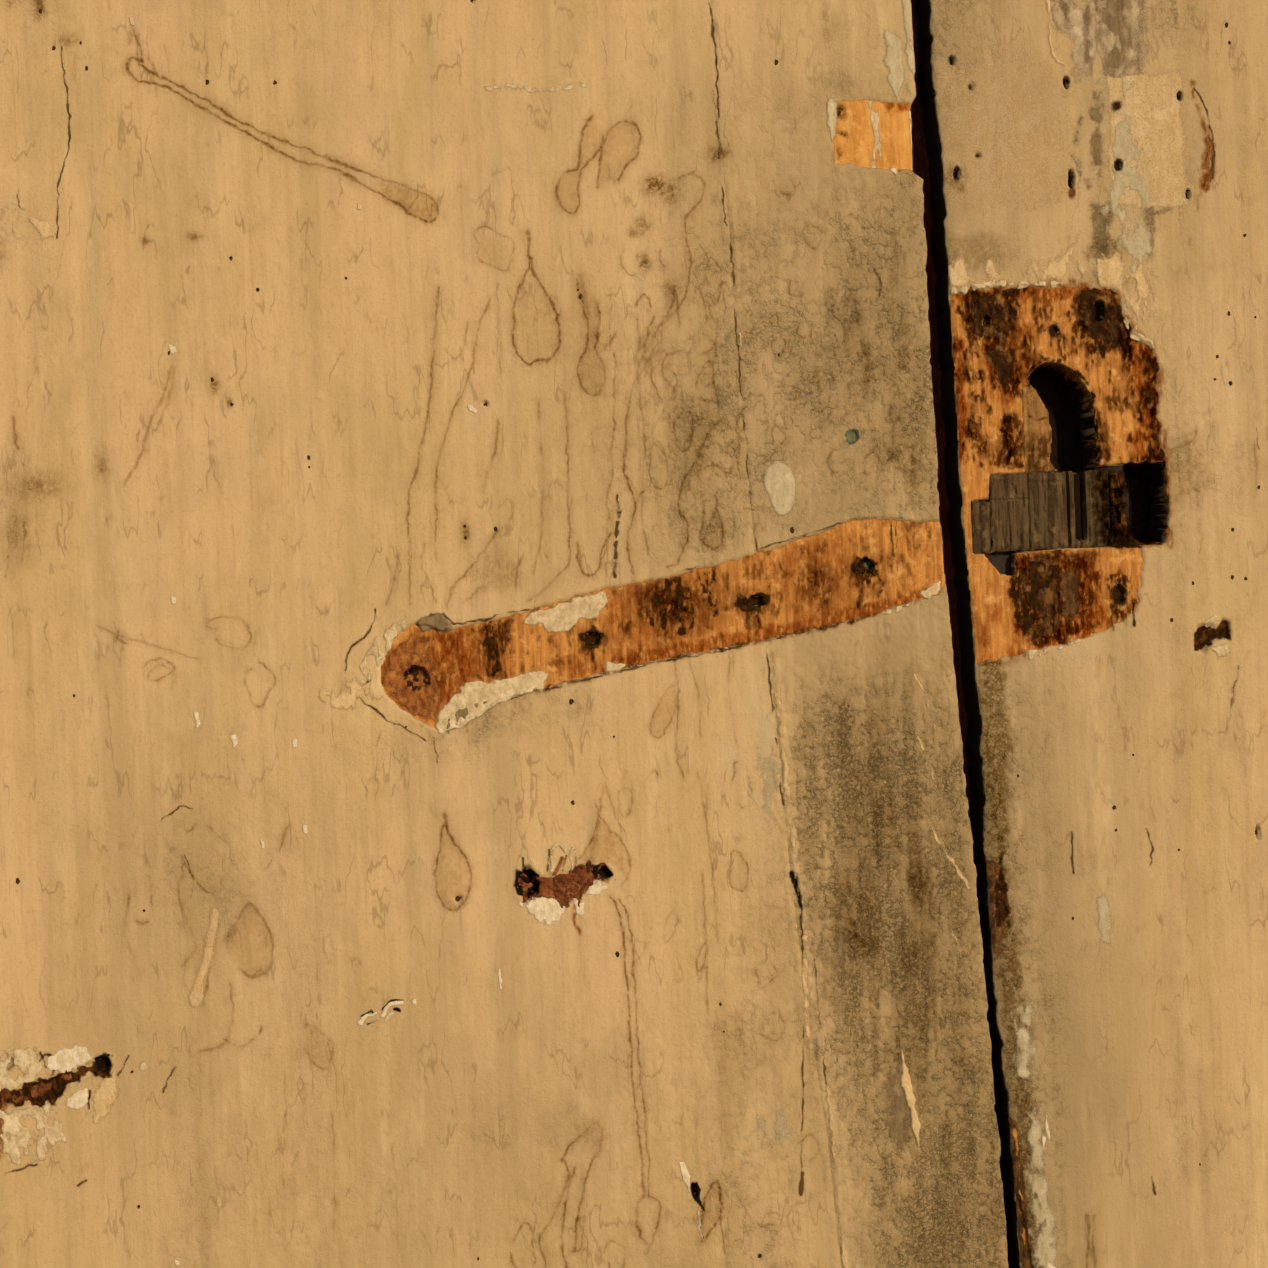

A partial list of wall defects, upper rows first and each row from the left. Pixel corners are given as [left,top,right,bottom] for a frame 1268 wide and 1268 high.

peeling [1046,0,1148,78]
crack [709,4,724,158]
peeling [827,0,914,174]
crack [722,188,735,284]
crack [734,315,751,495]
spalling [1194,615,1231,658]
spalling [514,868,540,898]
spalling [591,864,614,878]
water stain [929,821,970,889]
spalling [0,1045,148,1172]
water stain [888,1069,909,1151]